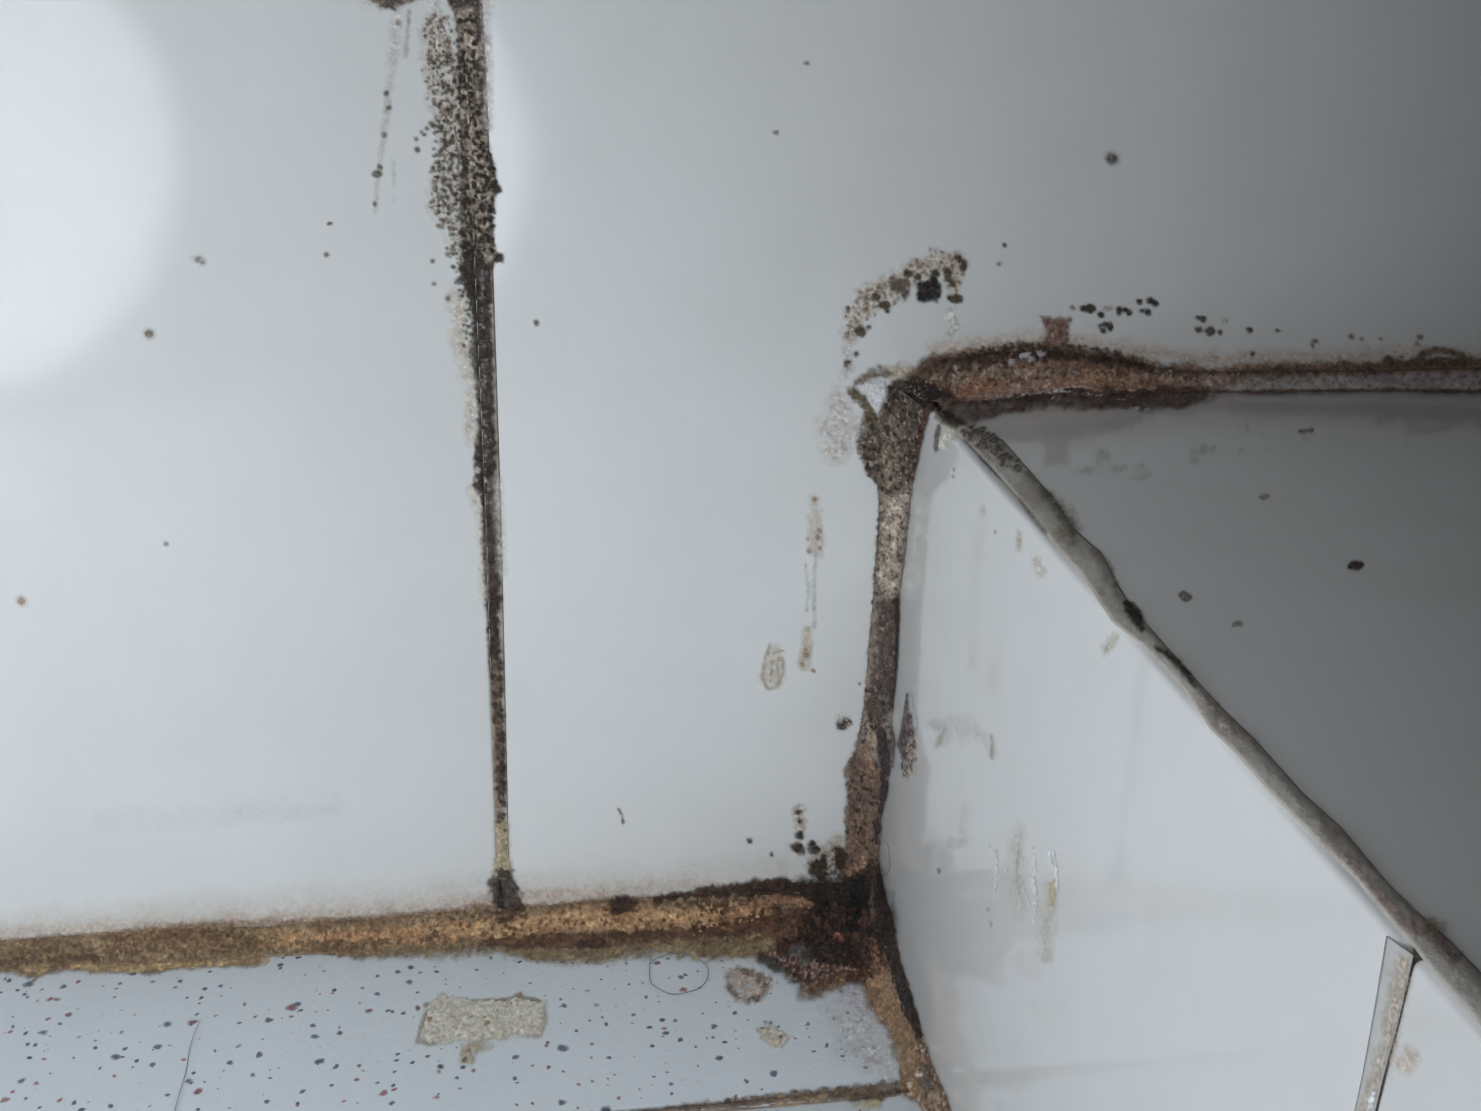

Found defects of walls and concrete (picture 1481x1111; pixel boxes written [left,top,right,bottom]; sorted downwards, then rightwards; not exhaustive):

leakage [371,0,525,914]
mould [825,251,1022,496]
mould [1071,298,1158,333]
leakage [1195,316,1227,336]